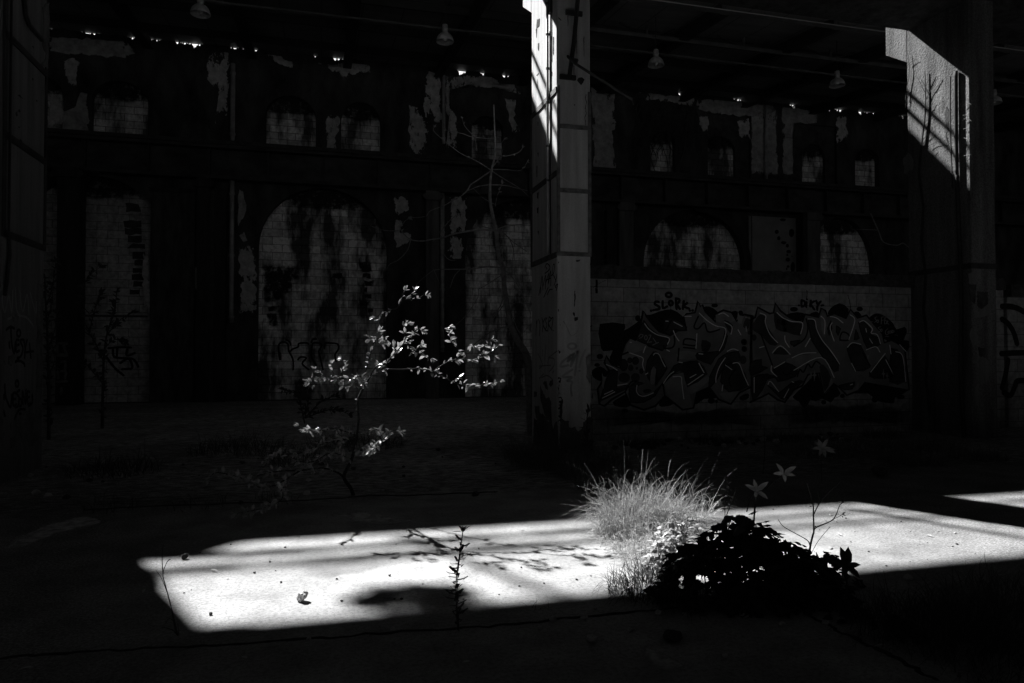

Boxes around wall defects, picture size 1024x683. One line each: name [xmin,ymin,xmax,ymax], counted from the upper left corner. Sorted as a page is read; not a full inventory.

flaking render [207,52,230,123]
flaking render [408,71,520,154]
flaking render [639,92,817,175]
flaking render [836,116,848,143]
flaking render [394,196,411,247]
flaking render [448,196,467,259]